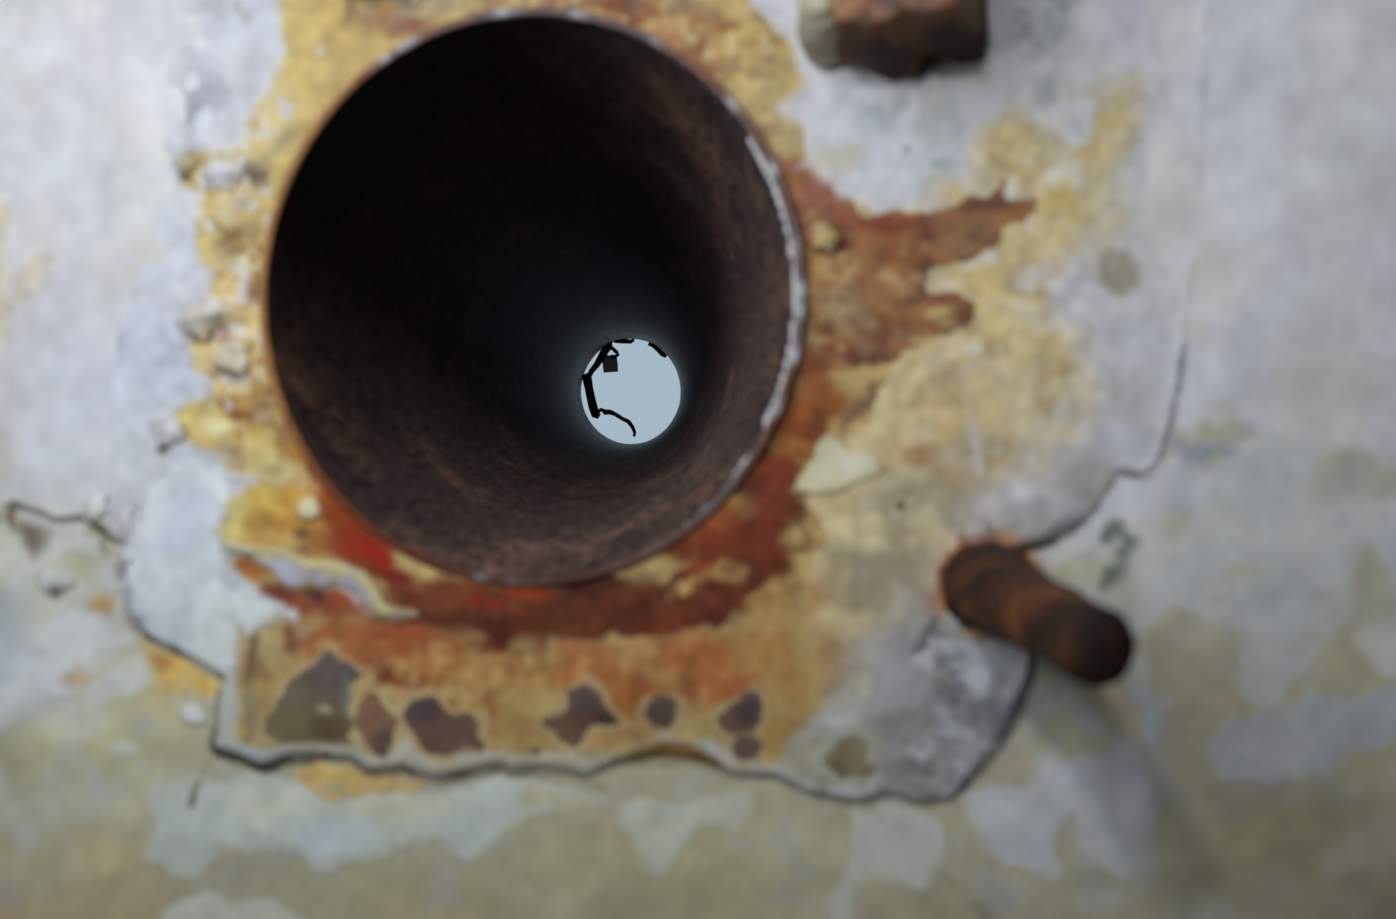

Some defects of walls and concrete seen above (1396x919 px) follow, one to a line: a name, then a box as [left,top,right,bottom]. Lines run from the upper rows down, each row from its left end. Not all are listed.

peeling [81,456,421,715]
peeling [135,640,772,919]
crack [0,496,1025,824]
corrosion [136,0,1159,805]
peeling [790,431,885,497]